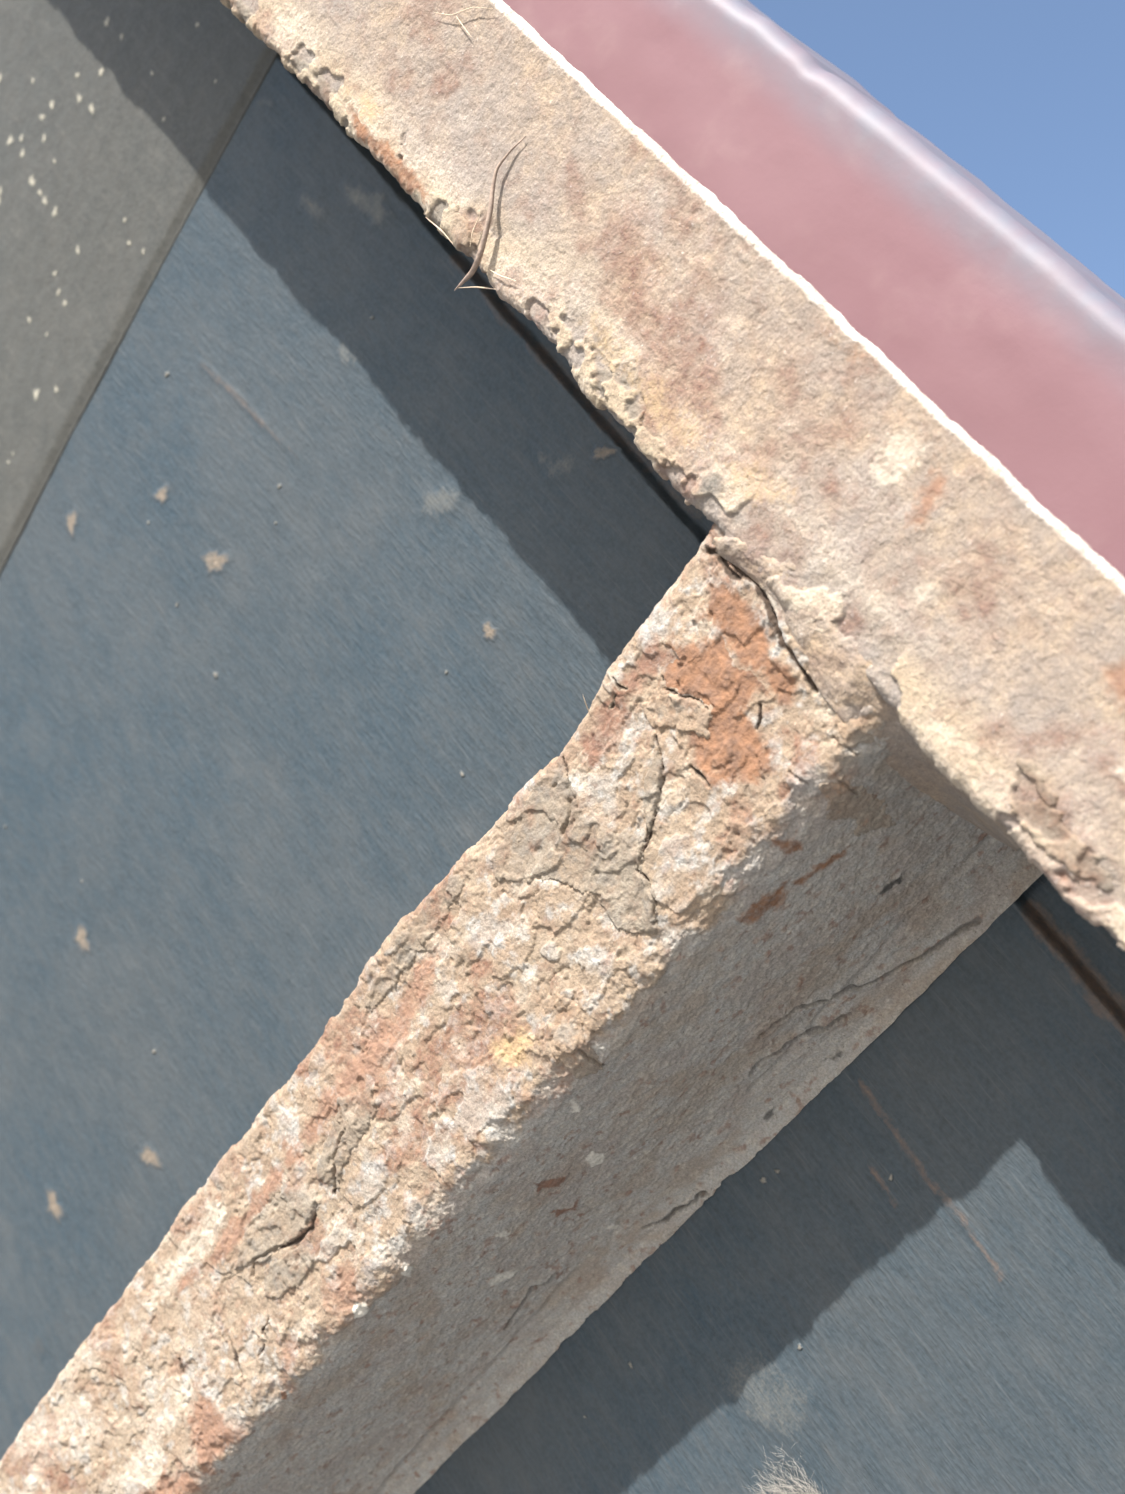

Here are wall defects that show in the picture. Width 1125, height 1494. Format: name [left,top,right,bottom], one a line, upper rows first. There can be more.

peeling [281,53,353,138]
peeling [424,192,477,257]
peeling [588,364,676,469]
peeling [691,466,728,508]
crack [702,544,820,695]
crack [608,673,704,710]
corrosion [570,559,807,800]
crack [641,732,710,926]
peeling [1009,758,1115,892]
crack [743,912,987,1079]
crack [249,1186,337,1279]
corrosion [133,1383,256,1494]